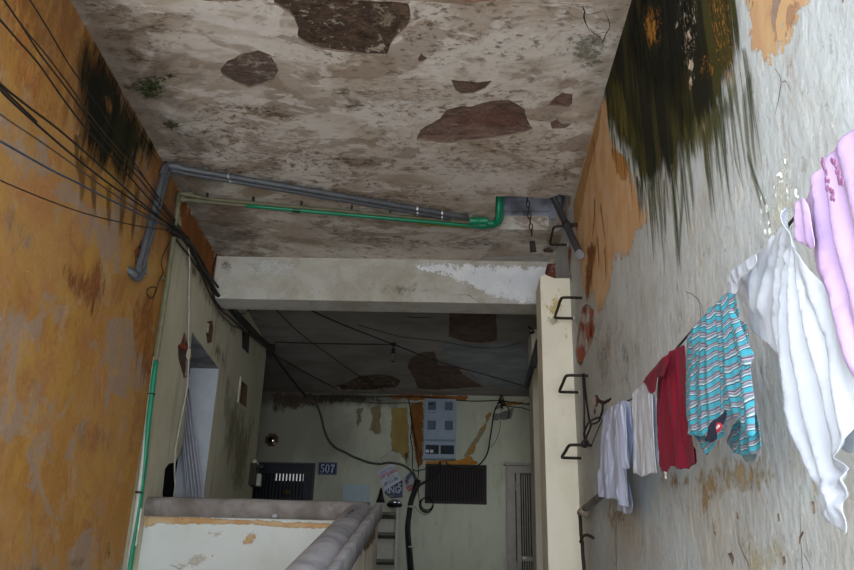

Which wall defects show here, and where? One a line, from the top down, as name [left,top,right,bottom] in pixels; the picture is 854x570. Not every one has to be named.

spalling [274,0,496,56]
spalling [221,50,279,88]
spalling [452,80,491,94]
spalling [417,100,533,143]
flaking render [407,313,529,393]
spalling [334,374,401,391]